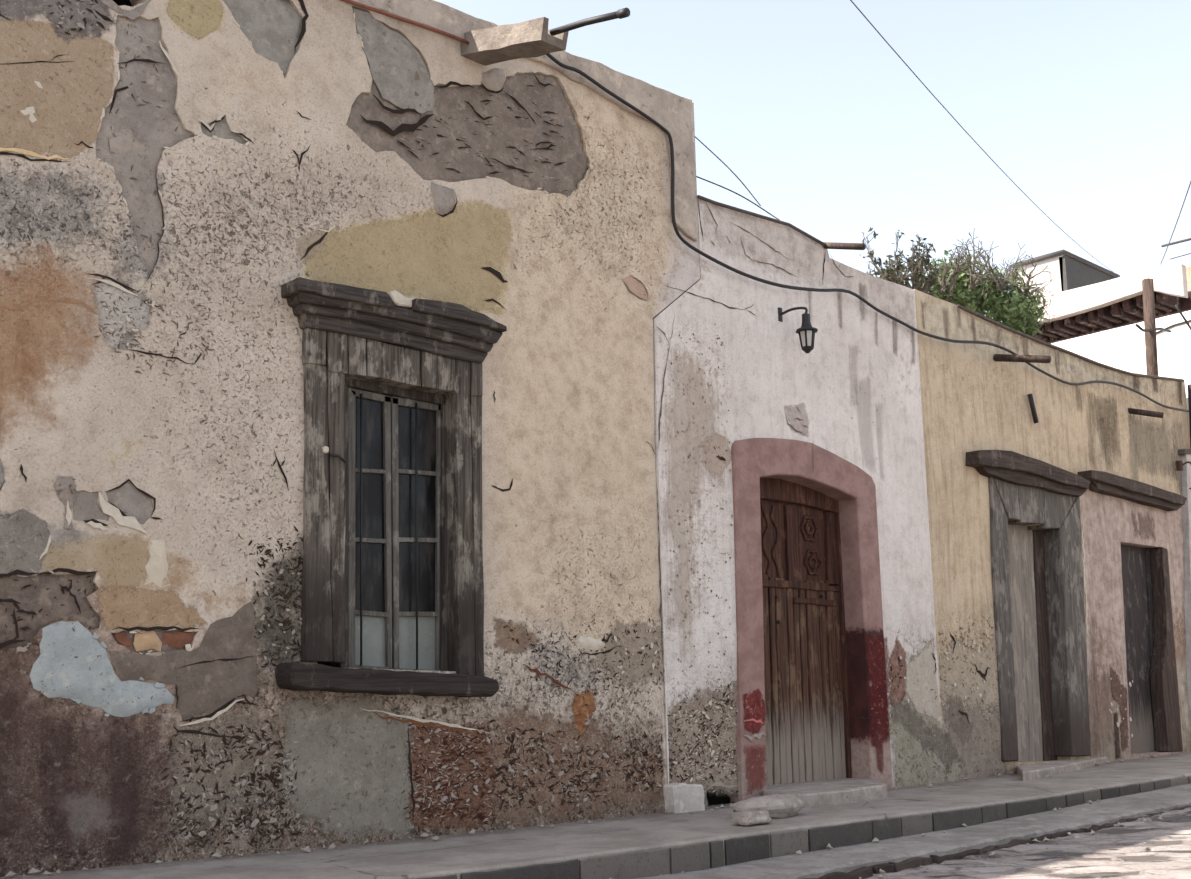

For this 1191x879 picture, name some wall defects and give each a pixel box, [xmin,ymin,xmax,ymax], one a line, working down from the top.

peeling [0,0,309,278]
flaking render [346,8,591,196]
flaking render [0,476,206,704]
flaking render [347,324,766,834]